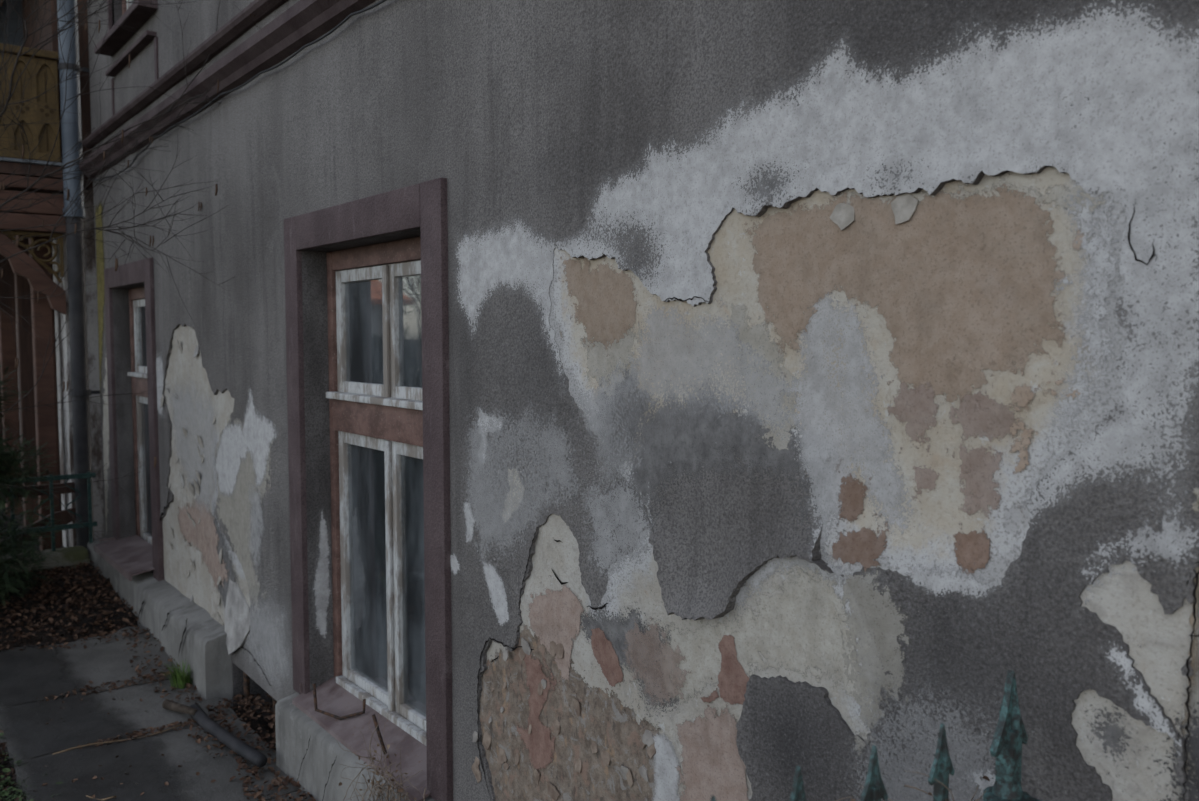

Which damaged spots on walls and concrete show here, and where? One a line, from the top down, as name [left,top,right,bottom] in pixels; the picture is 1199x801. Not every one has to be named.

peeling [160,325,251,655]
water stain [450,553,460,574]
water stain [653,734,680,801]
peeling [472,166,1127,801]
water stain [454,0,1199,768]
water stain [971,769,995,801]
peeling [1072,560,1199,801]
crack [1183,562,1199,801]